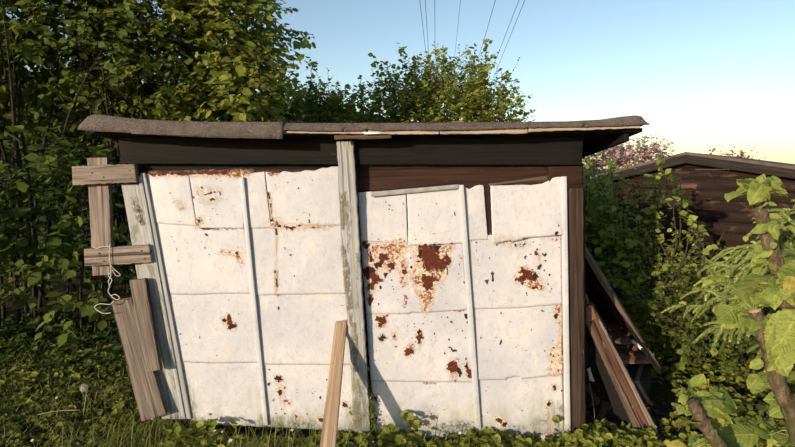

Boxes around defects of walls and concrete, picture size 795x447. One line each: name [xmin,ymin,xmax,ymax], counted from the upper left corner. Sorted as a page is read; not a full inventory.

corrosion [148,169,249,179]
corrosion [193,186,232,230]
corrosion [268,192,334,250]
corrosion [361,239,453,313]
corrosion [515,267,544,290]
corrosion [222,314,237,330]
corrosion [375,315,396,341]
corrosion [404,329,424,356]
corrosion [549,305,563,391]
corrosion [446,358,472,382]
corrosion [274,375,291,405]